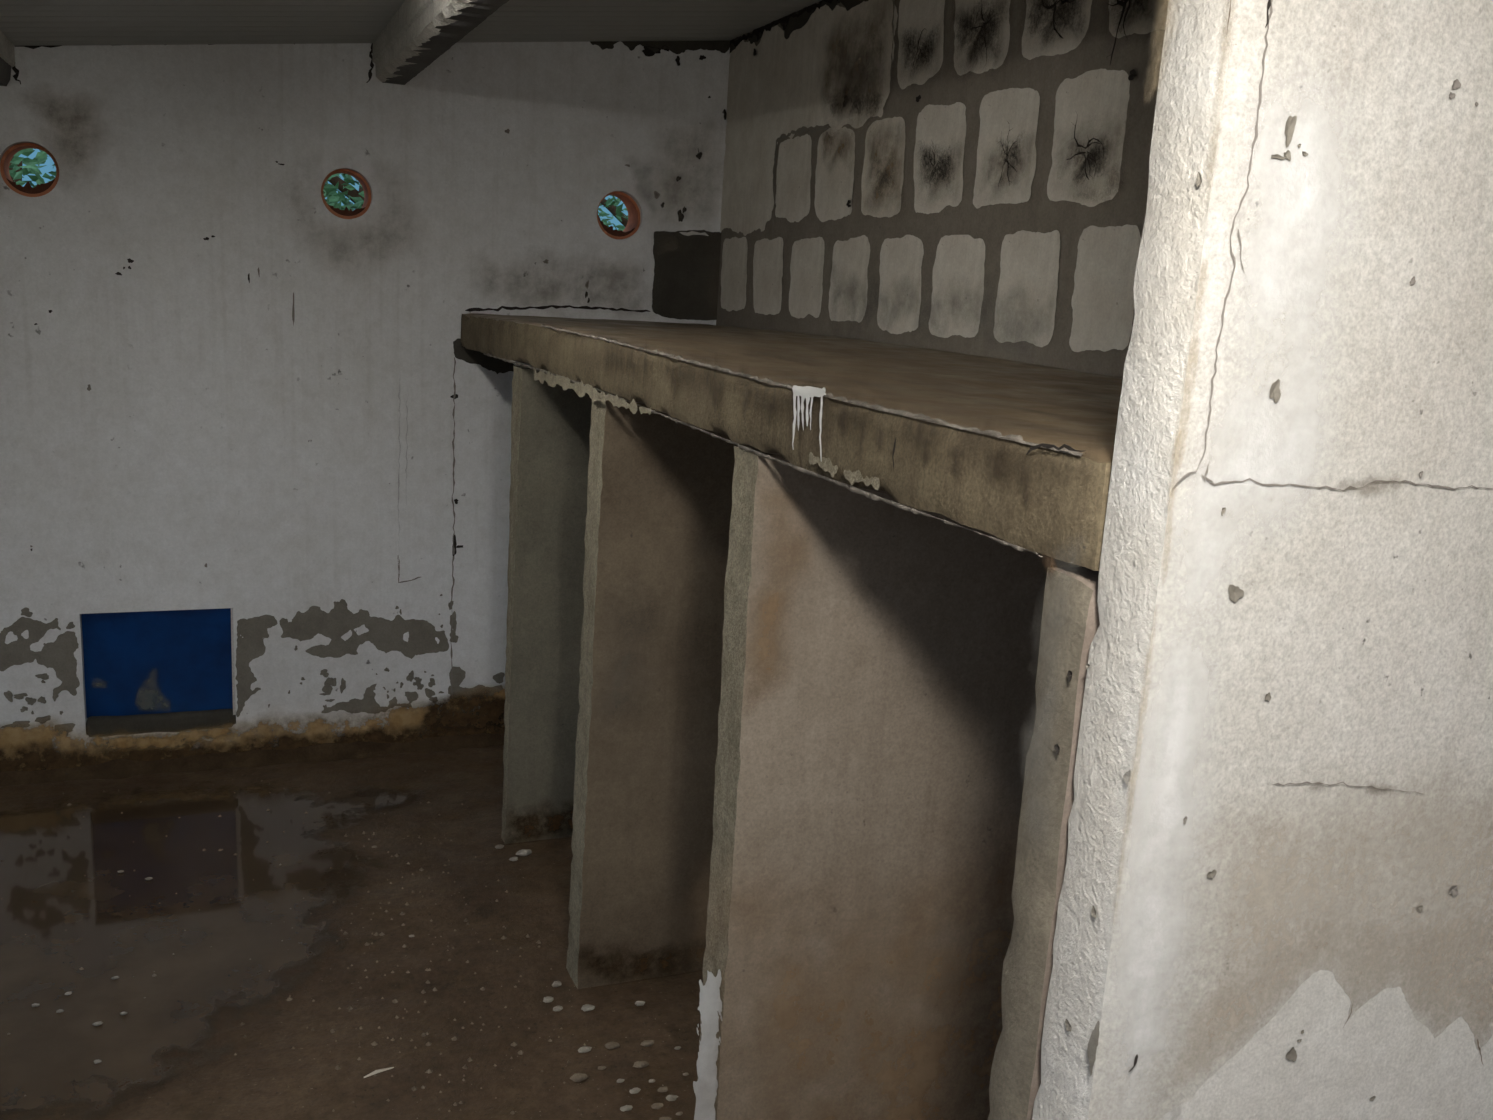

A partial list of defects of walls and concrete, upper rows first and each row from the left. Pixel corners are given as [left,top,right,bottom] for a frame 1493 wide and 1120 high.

crack [12,45,63,84]
water stain [960,8,995,67]
water stain [870,142,896,202]
water stain [922,140,953,184]
water stain [1066,114,1109,181]
crack [1171,0,1492,491]
water stain [792,385,826,457]
peeling [0,607,80,736]
peeling [235,599,505,717]
water stain [0,688,506,772]
peeling [1286,1030,1304,1062]